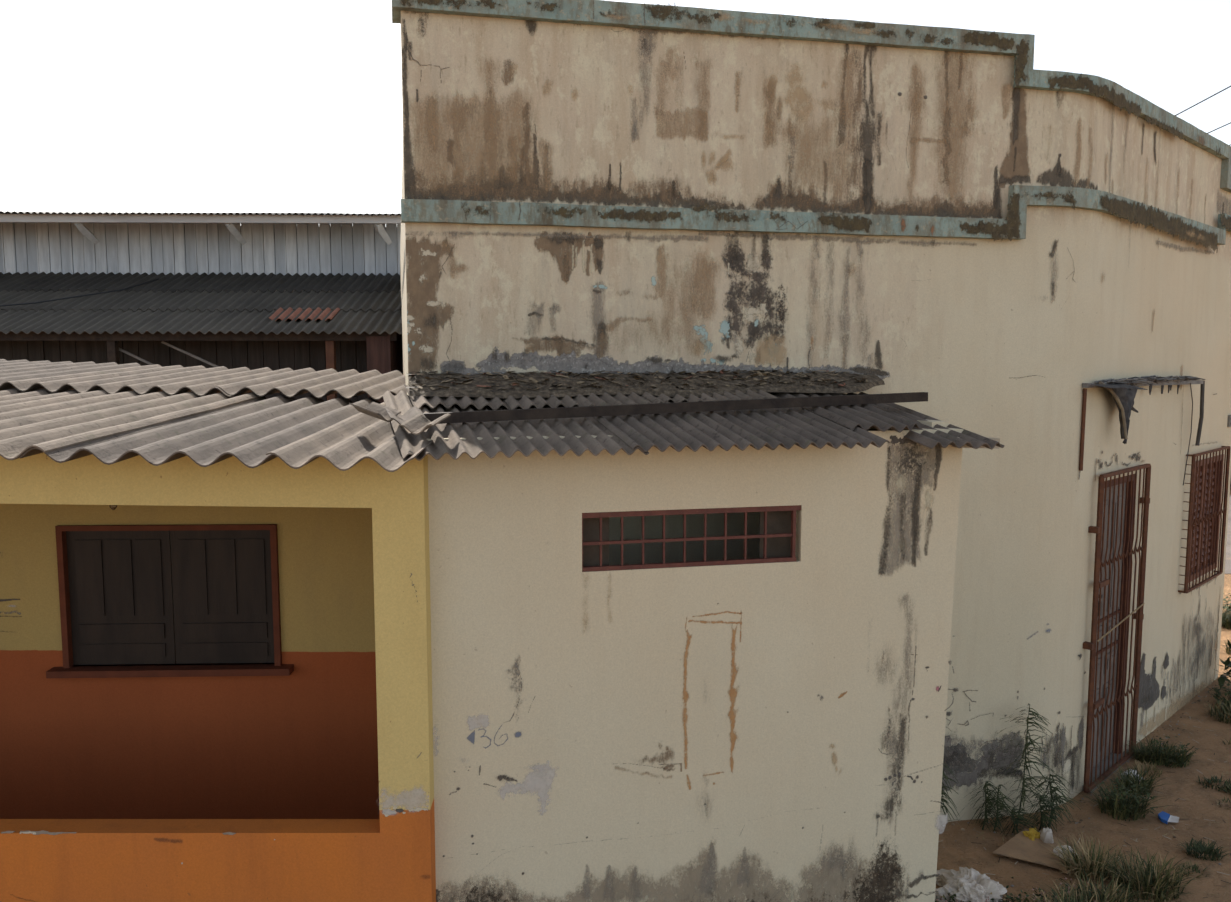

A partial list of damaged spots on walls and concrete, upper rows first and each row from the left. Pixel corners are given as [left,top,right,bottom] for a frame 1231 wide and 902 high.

leakage [401,0,1231,376]
flaking render [405,237,466,385]
leakage [879,436,942,575]
leakage [1170,577,1220,700]
peeling [382,789,428,817]
leakage [876,700,911,819]
leakage [1039,716,1084,800]
leakage [436,834,940,902]